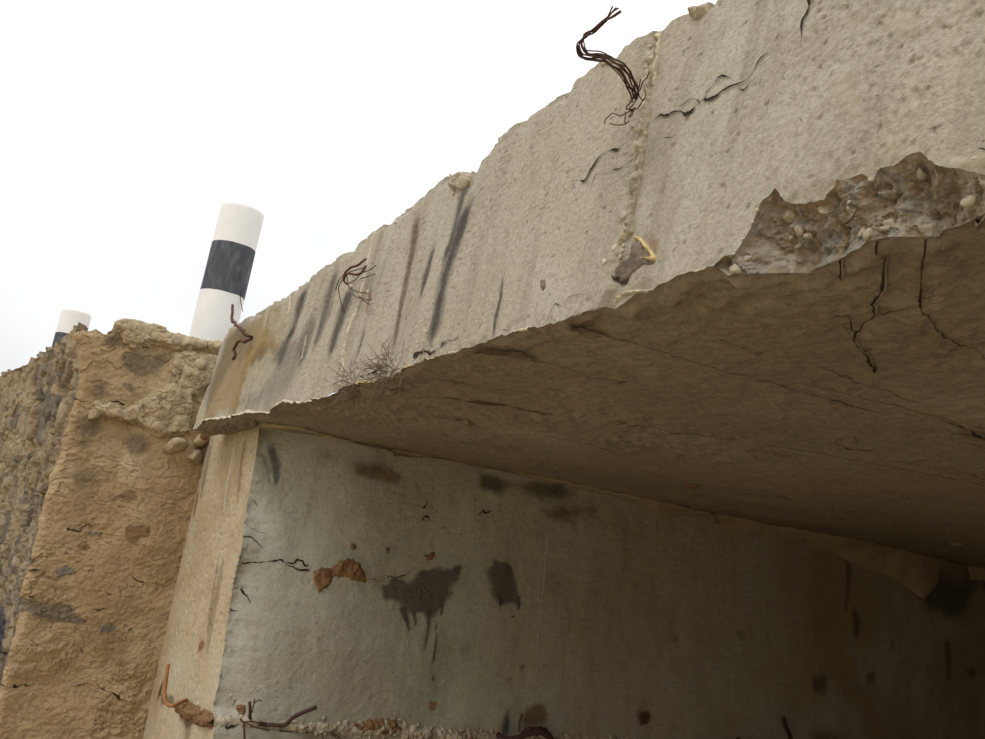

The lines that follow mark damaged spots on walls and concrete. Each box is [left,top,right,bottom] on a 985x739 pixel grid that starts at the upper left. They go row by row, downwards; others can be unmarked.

crack [653,53,767,121]
crack [580,136,636,188]
spalling [692,148,985,277]
leakage [430,208,468,337]
leakage [287,293,305,337]
leakage [330,293,350,352]
crack [547,236,985,447]
crack [241,500,309,571]
leakage [383,566,461,661]
leakage [489,562,520,617]